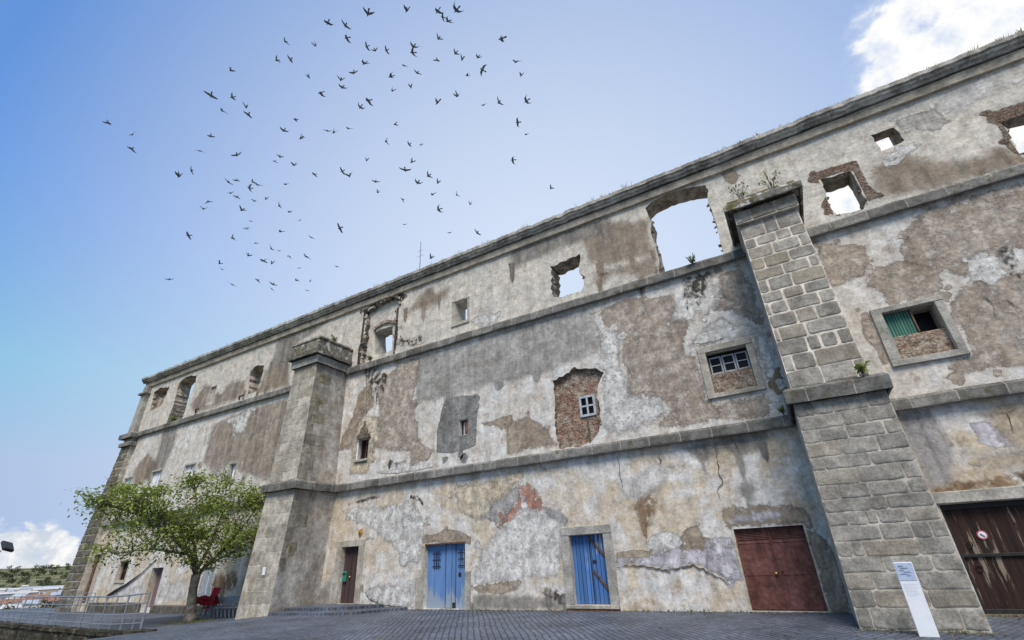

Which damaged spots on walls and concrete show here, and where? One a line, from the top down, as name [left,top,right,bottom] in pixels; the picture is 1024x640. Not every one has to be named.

flaking render [882,77,1024,167]
spalling [808,161,884,216]
flaking render [811,183,1024,385]
flaking render [339,264,787,474]
crack [714,437,737,498]
flaking render [345,470,572,594]
flaking render [615,502,850,613]